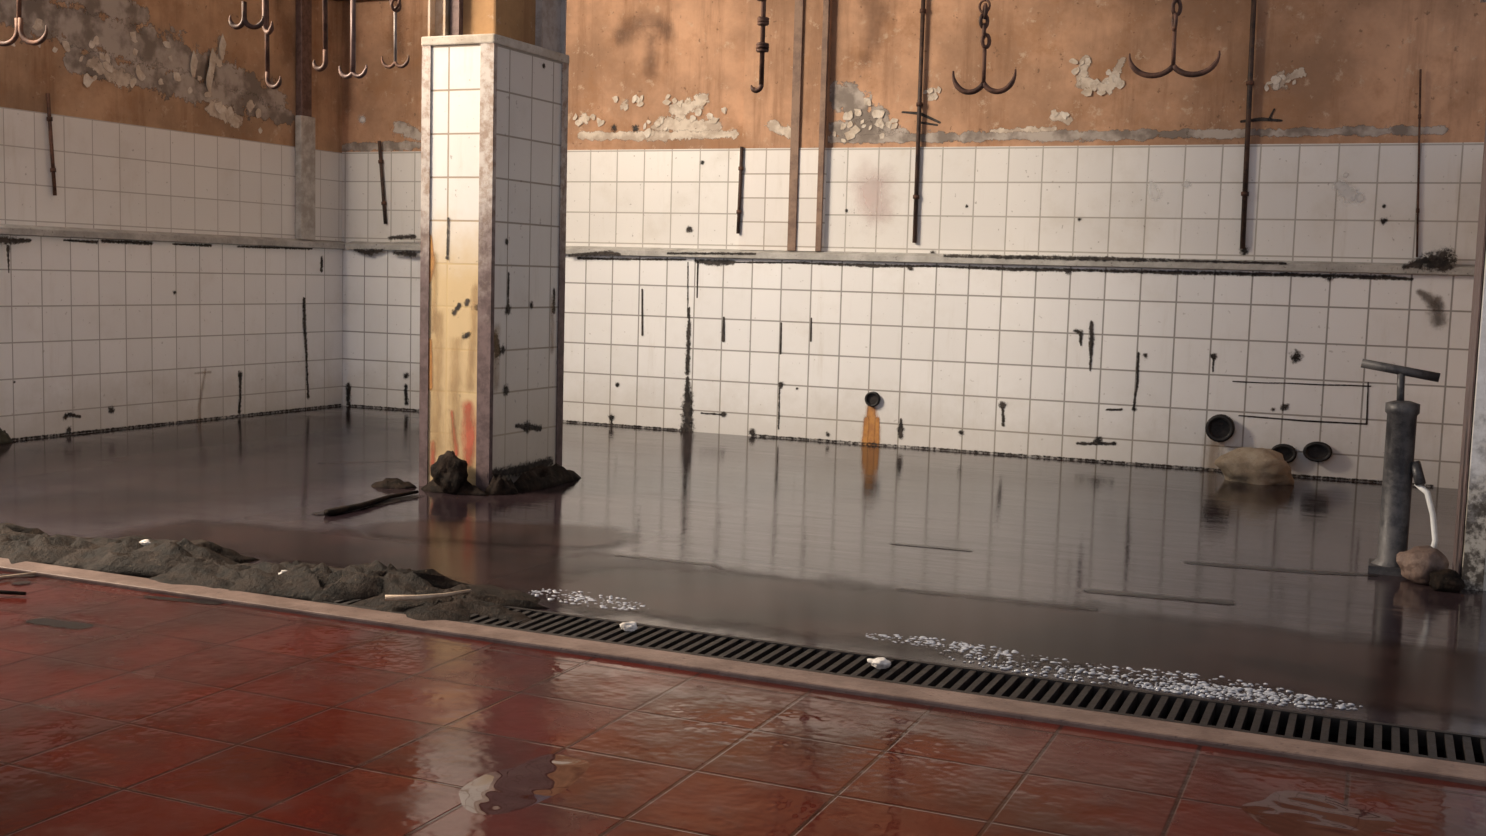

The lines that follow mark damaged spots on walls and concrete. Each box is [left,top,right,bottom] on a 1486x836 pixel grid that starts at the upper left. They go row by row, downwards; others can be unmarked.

peeling [0,0,295,134]
peeling [1069,55,1126,97]
peeling [1264,67,1307,91]
peeling [573,93,739,143]
peeling [828,80,1448,144]